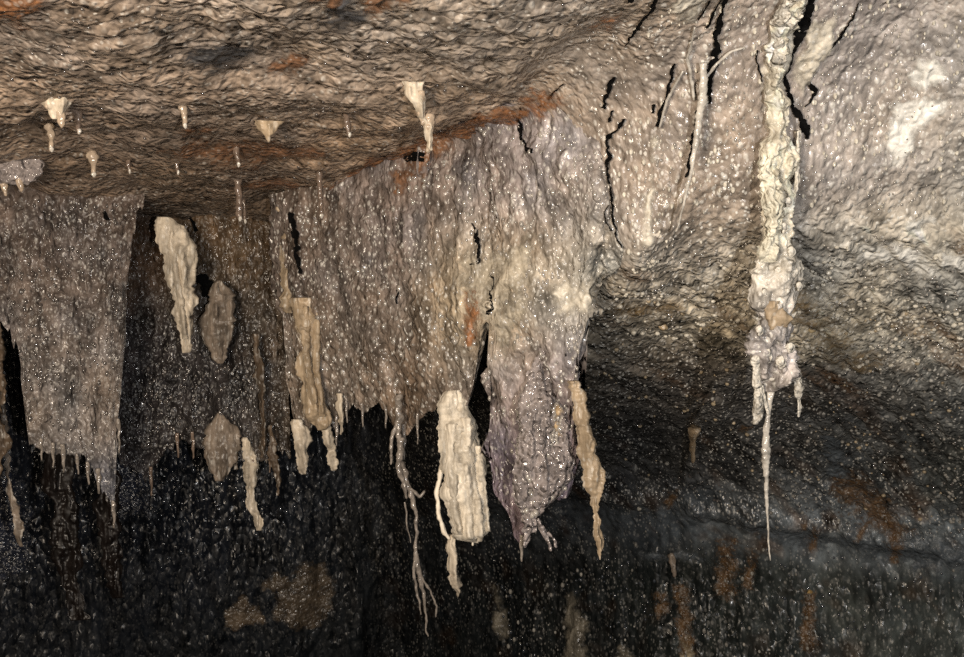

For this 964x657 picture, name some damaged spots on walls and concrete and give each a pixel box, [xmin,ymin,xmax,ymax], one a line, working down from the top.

rust [0,0,41,29]
rust [330,87,560,194]
crack [601,77,625,248]
crack [651,64,676,127]
efflorescence [672,0,707,23]
crack [685,0,728,178]
crack [755,0,818,140]
efflorescence [778,19,835,90]
crack [832,3,859,48]
efflorescence [451,235,531,351]
damp [551,276,601,312]
damp [0,463,33,579]